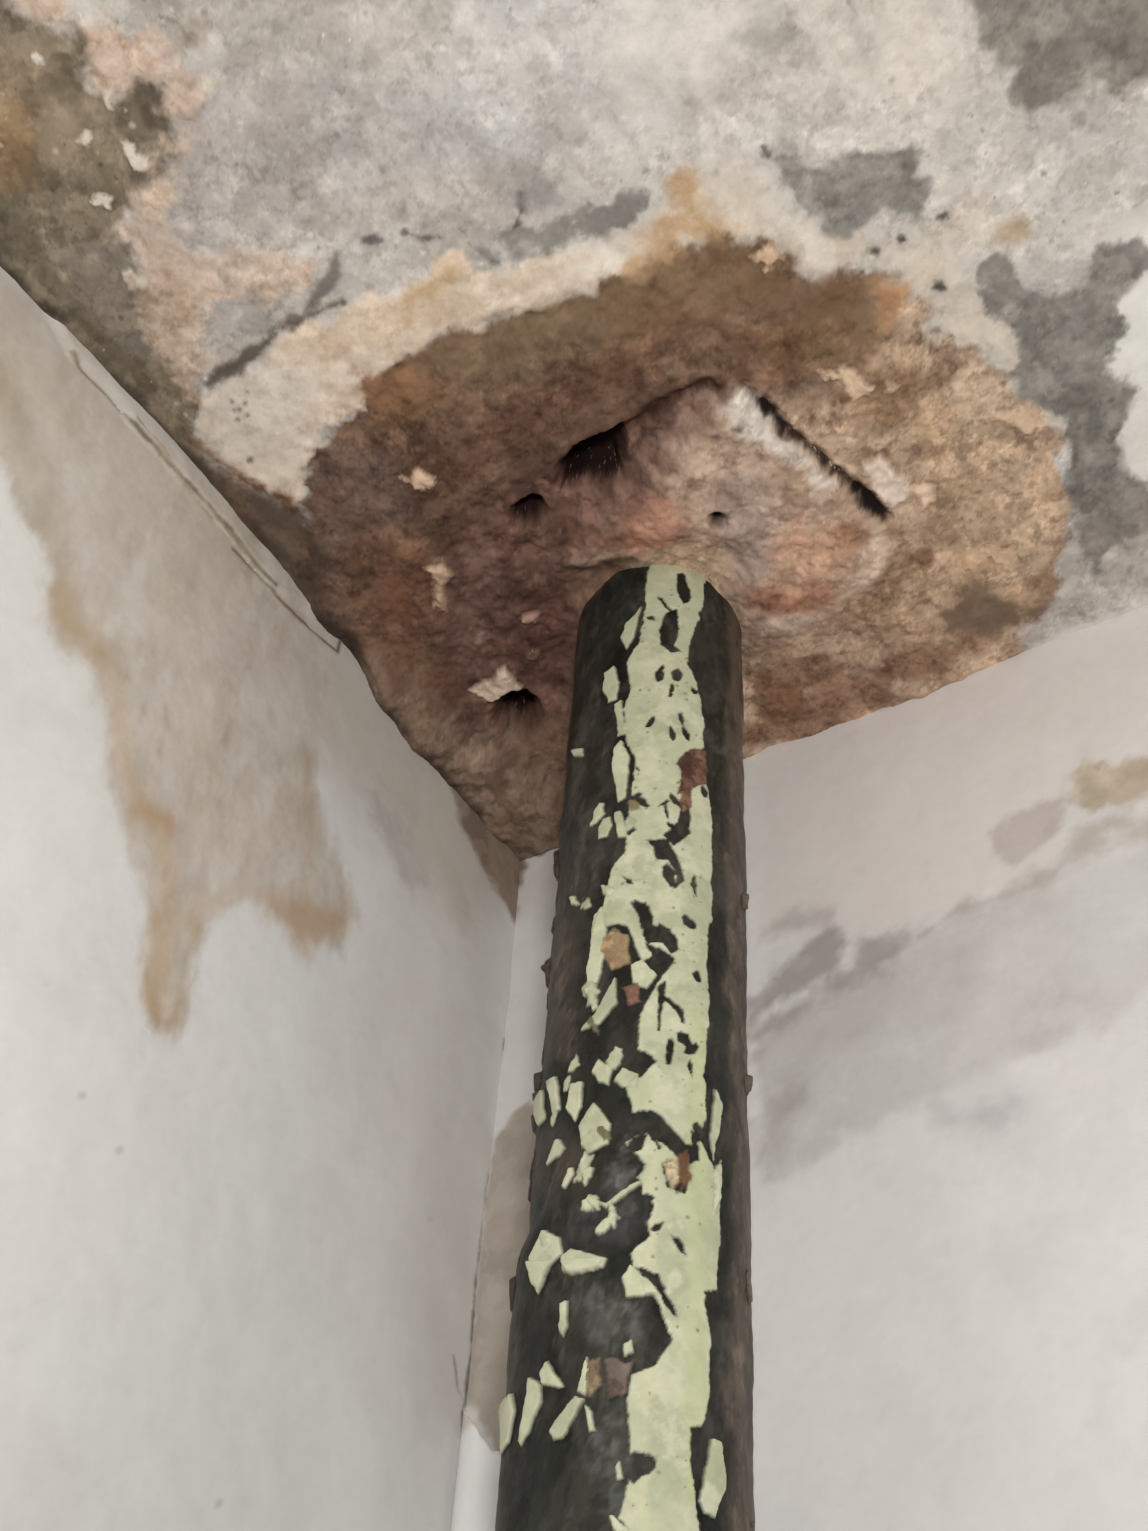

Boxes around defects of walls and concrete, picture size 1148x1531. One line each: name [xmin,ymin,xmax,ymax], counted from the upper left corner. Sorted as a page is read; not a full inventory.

damp [0,0,363,1053]
crack [545,444,578,485]
spalling [417,378,735,766]
peeling [73,0,1148,500]
rust [190,158,1076,759]
crack [618,375,894,528]
damp [639,121,1148,581]
damp [957,0,1148,119]
peeling [525,885,659,1299]
rust [674,747,709,814]
damp [746,723,1148,1191]
peeling [498,1356,597,1456]